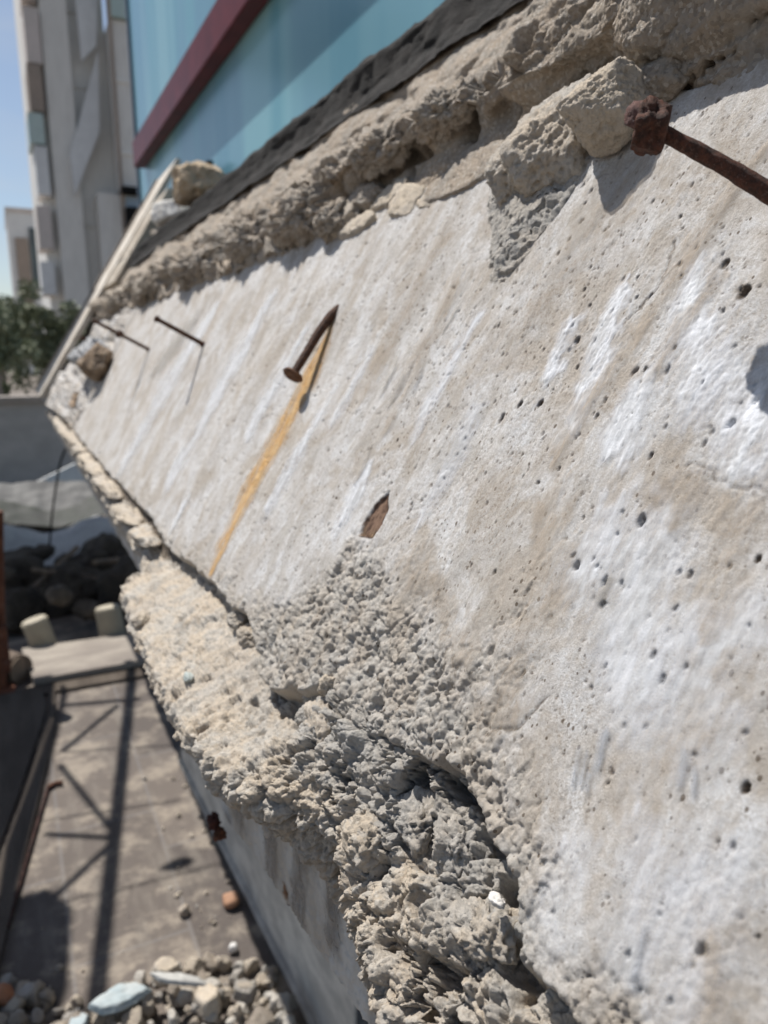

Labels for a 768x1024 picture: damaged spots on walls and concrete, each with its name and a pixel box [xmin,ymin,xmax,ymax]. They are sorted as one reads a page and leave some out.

spalling [88,0,768,322]
corrosion [210,321,333,575]
corrosion [359,494,389,538]
spalling [45,409,578,1024]